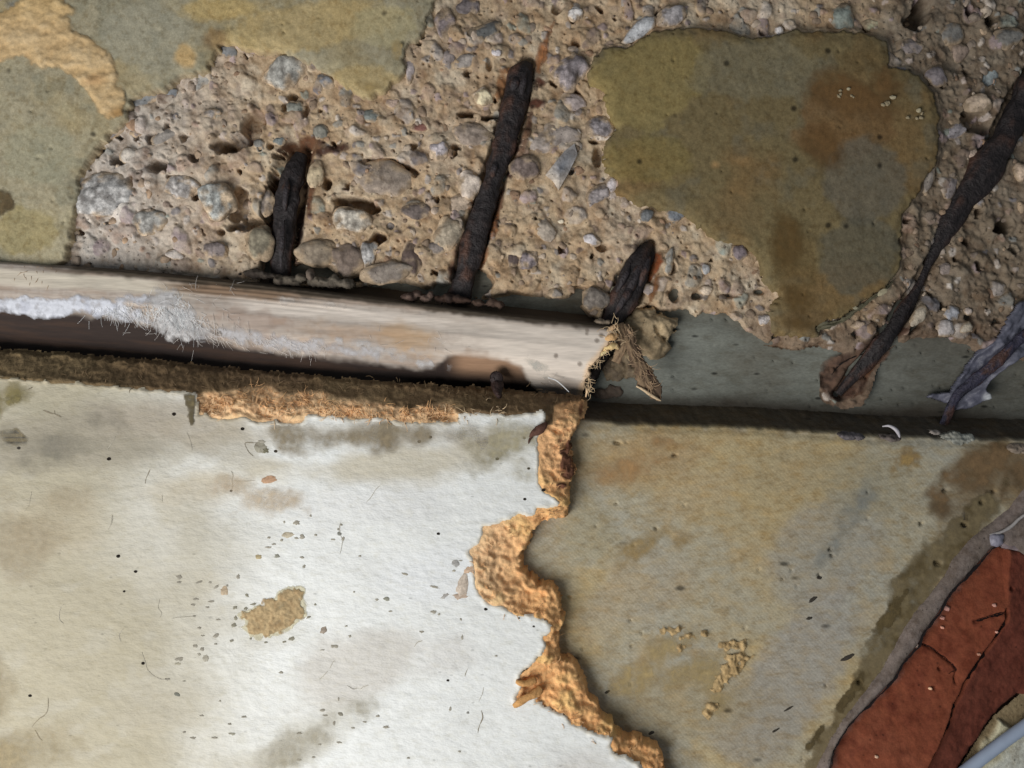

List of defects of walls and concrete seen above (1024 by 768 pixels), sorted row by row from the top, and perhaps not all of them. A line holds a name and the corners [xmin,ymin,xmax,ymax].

damp [813,72,899,113]
rust [266,178,314,269]
rust [277,136,348,164]
rust [488,190,504,237]
spalling [65,0,1024,361]
rust [626,253,663,301]
spalling [819,363,880,409]
rust [819,328,908,401]
peeling [191,574,316,662]
damp [805,443,1024,768]